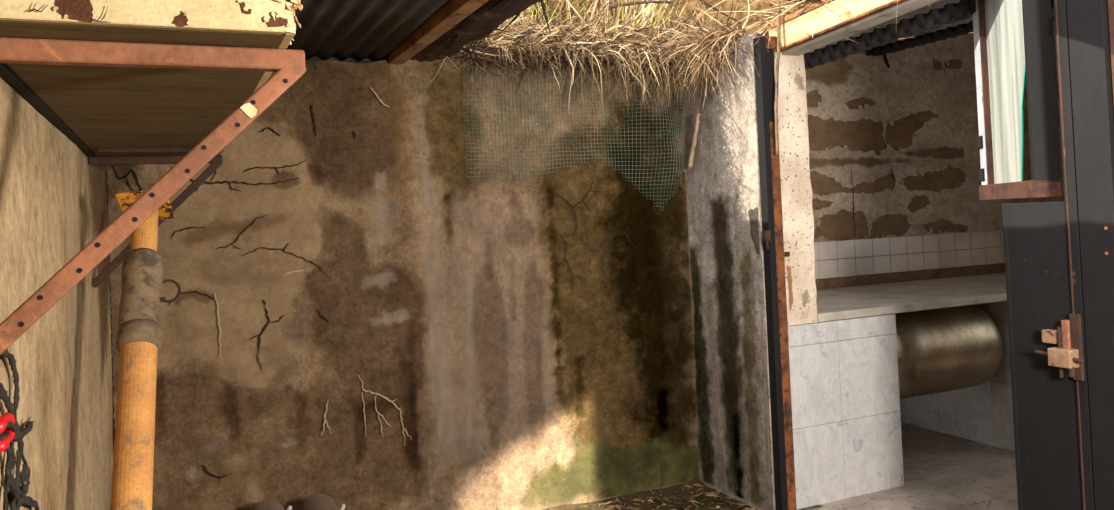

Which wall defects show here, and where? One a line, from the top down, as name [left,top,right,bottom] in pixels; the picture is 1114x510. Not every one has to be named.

crack [309,105,317,136]
peeling [806,89,938,156]
crack [106,166,142,209]
crack [190,161,305,192]
peeling [810,165,970,241]
crack [171,215,329,278]
damp [605,103,742,498]
crack [108,255,116,455]
crack [250,300,284,370]
crack [202,465,231,478]